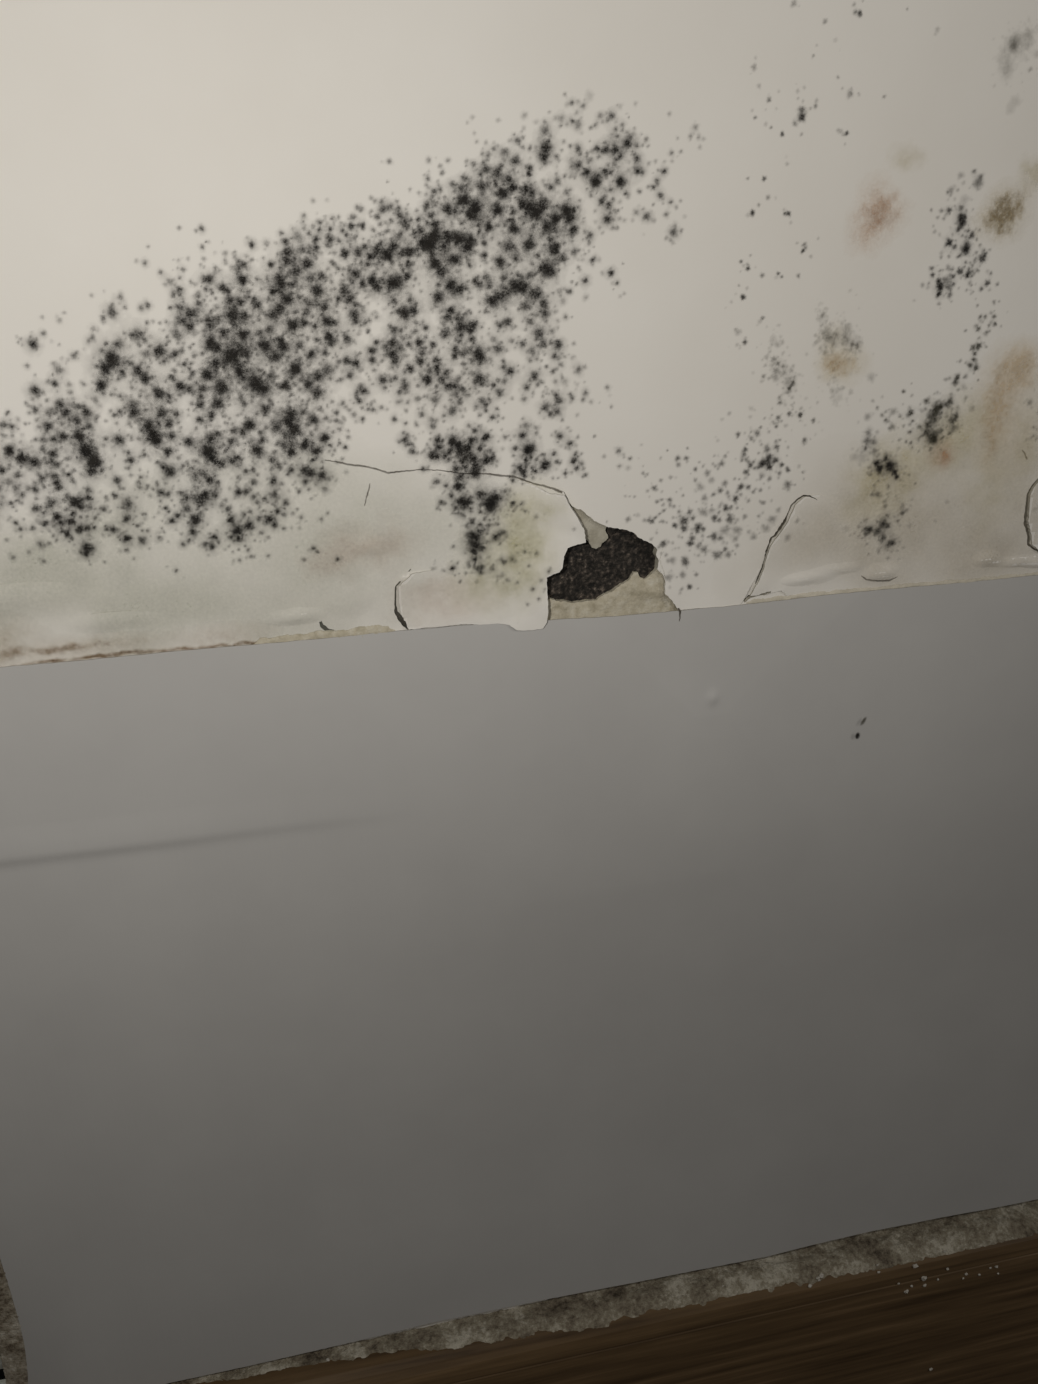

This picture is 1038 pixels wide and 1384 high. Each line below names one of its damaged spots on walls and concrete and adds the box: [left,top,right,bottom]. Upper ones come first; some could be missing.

leakage [932,209,986,296]
leakage [0,114,672,574]
leakage [908,315,996,442]
crack [394,569,411,628]
crack [338,462,562,506]
peeling [254,478,871,644]
leakage [673,434,789,564]
crack [743,495,814,602]
leakage [864,447,899,482]
crack [1022,450,1038,552]
flaking render [0,1259,28,1384]